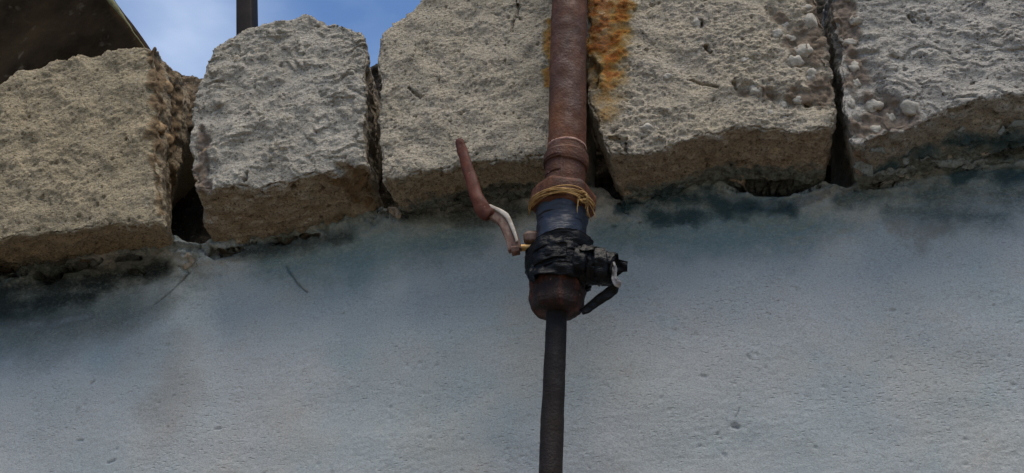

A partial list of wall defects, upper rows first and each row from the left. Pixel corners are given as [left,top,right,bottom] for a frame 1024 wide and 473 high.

rust [586,0,635,120]
damp [227,183,532,274]
damp [599,185,826,247]
damp [835,165,1024,223]
damp [862,128,1024,176]
damp [0,257,173,342]